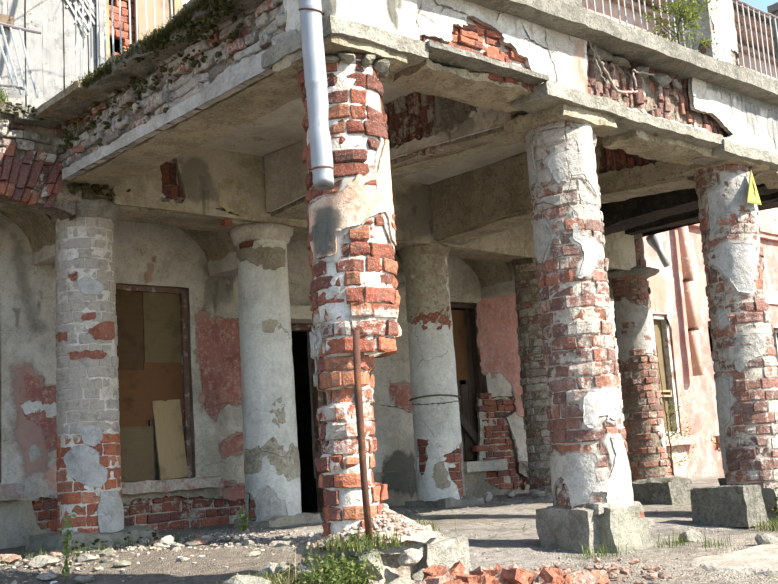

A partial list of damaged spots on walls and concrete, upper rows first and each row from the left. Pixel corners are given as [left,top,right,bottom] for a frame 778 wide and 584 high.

crack [416,0,472,28]
spalling [420,18,530,70]
crack [522,26,578,83]
spalling [586,49,727,137]
peeling [569,207,602,278]
peeling [195,310,242,422]
peeling [309,328,323,392]
peeling [472,294,526,490]
peeling [614,297,657,363]
peeling [712,328,767,475]
spalling [417,437,467,499]
peeling [550,386,634,508]